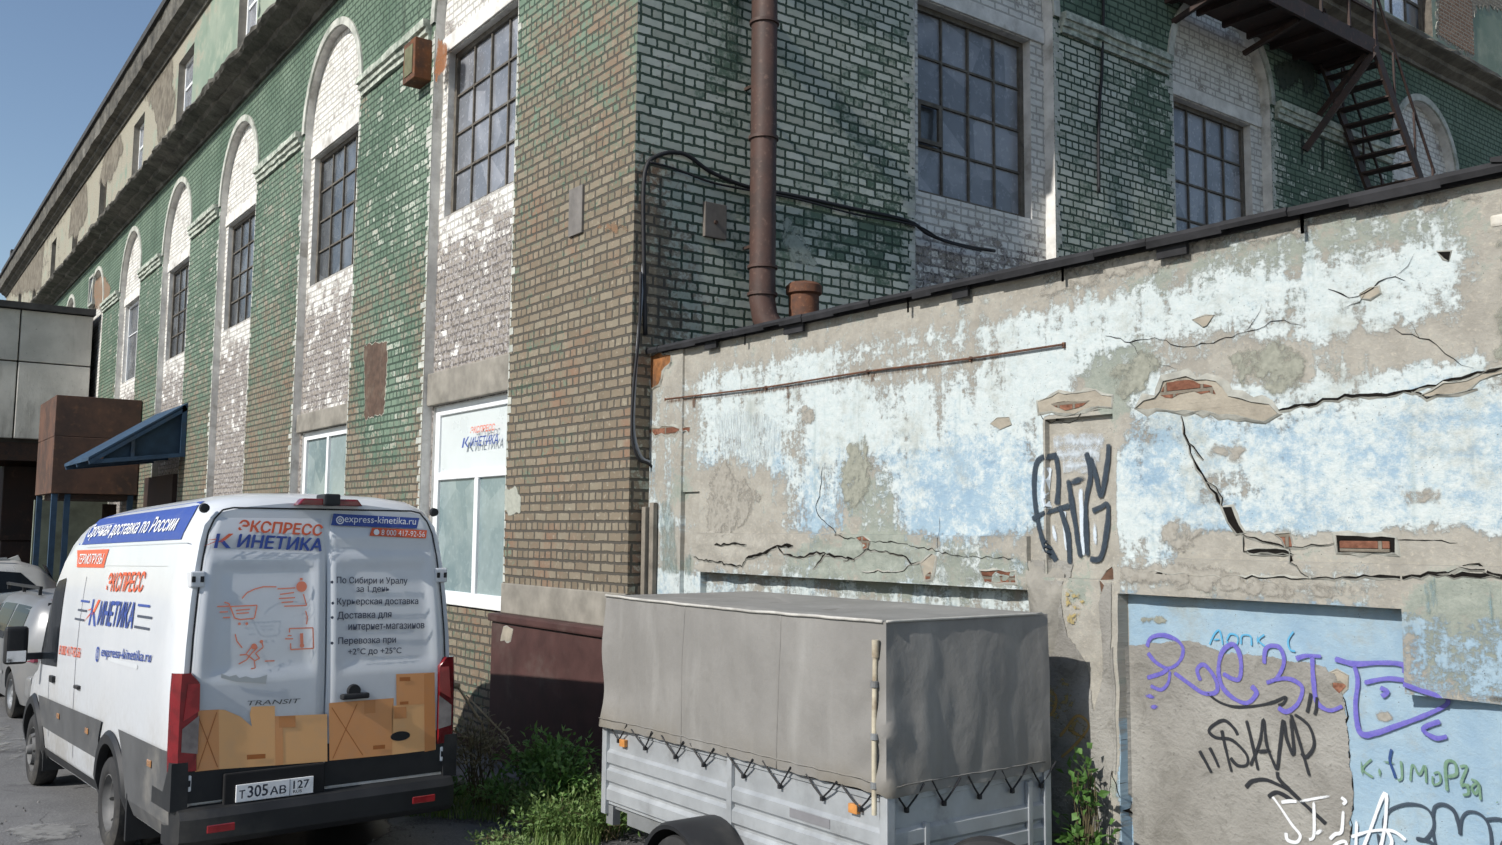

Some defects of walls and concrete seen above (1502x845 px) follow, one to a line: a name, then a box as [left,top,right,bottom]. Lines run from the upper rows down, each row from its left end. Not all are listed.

spalling [1435,0,1502,58]
corrosion [664,342,1066,408]
spalling [1036,340,1305,424]
crack [694,467,1007,573]
crack [1149,416,1502,582]
spalling [1329,668,1349,695]